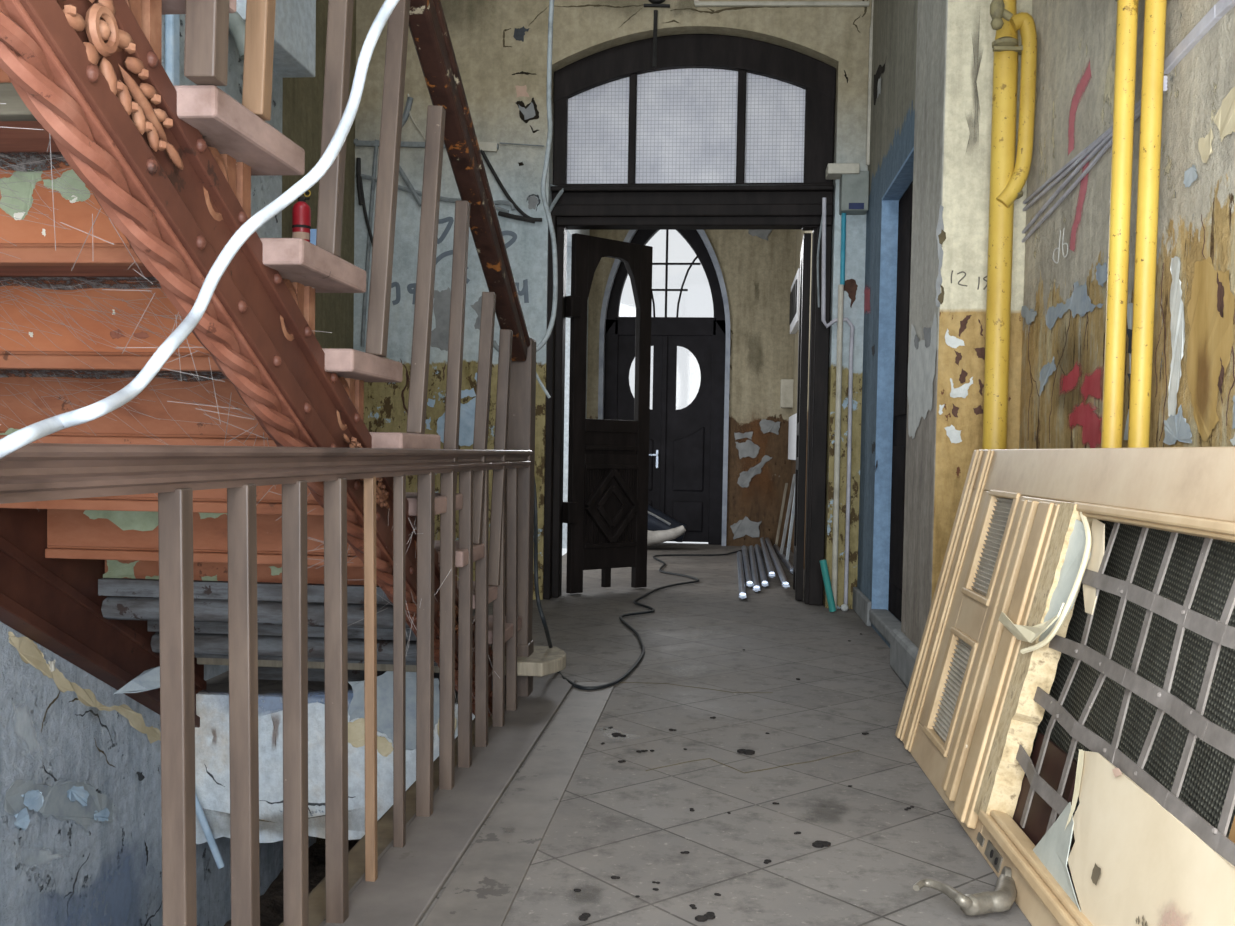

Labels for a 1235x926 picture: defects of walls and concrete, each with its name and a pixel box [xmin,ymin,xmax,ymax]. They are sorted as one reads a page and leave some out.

crack [529,4,788,28]
spalling [512,71,539,133]
peeling [1184,87,1235,188]
peeling [0,169,90,220]
peeling [907,204,985,443]
peeling [1021,262,1107,330]
spalling [1124,303,1133,440]
peeling [1163,256,1235,446]
peeling [459,373,477,446]
peeling [734,419,780,488]
peeling [730,516,761,539]
spalling [8,631,161,744]